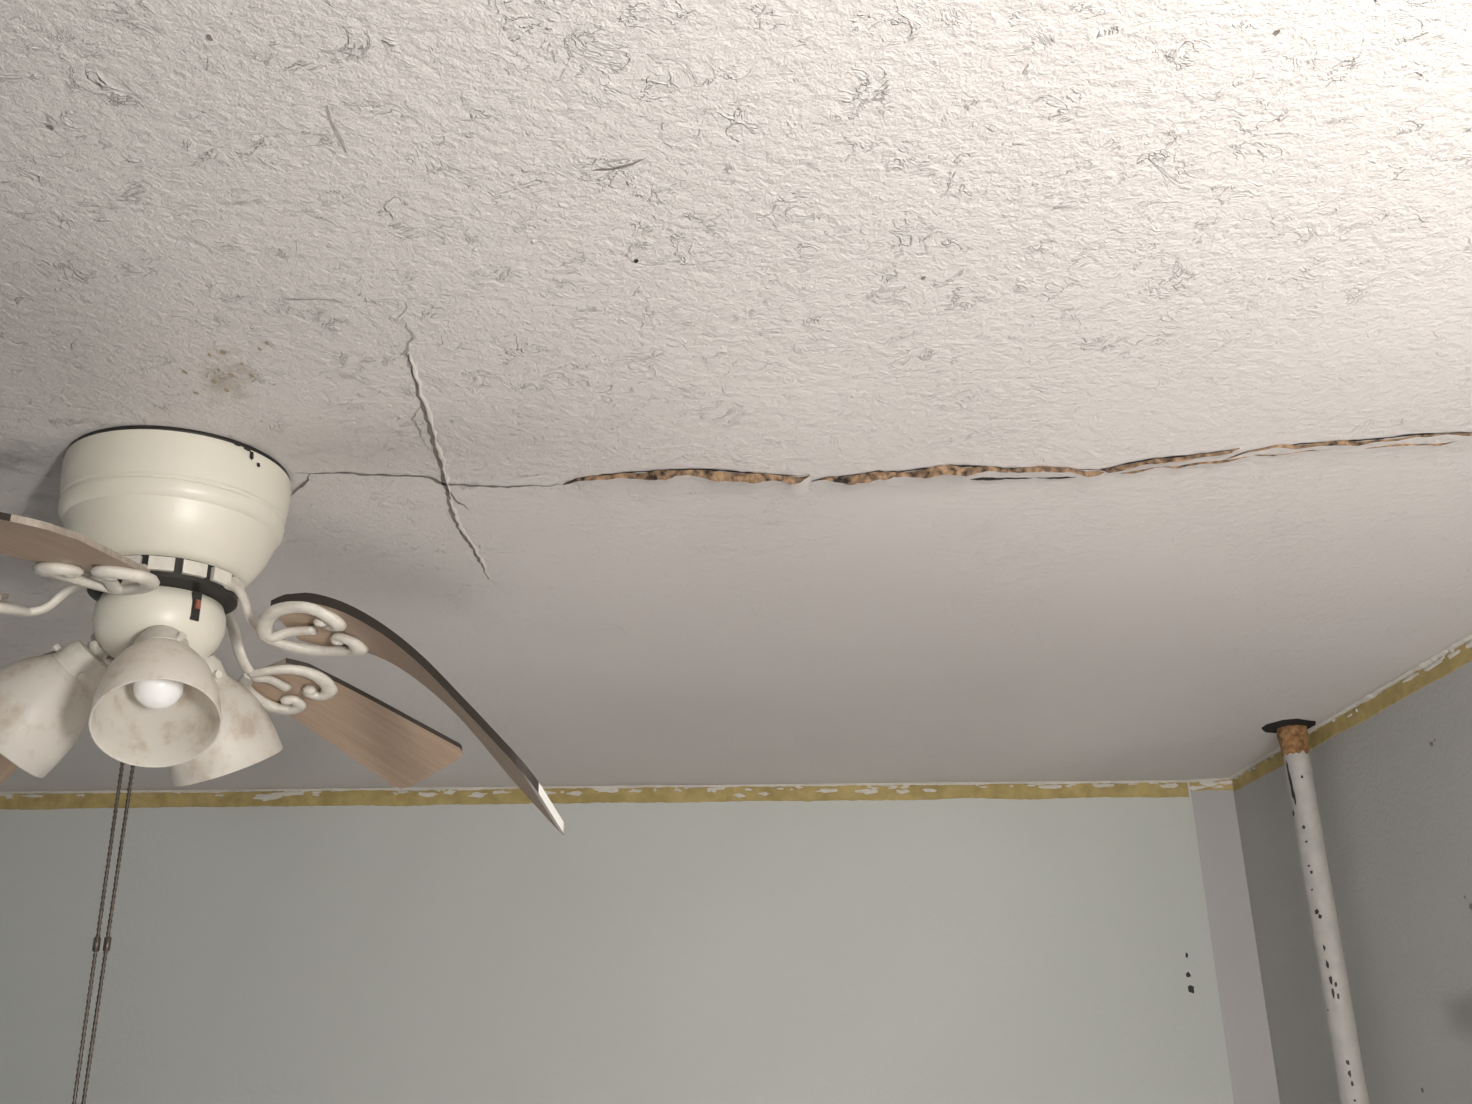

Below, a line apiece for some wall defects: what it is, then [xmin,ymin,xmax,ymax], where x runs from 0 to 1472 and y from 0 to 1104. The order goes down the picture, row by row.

crack [291,319,1472,579]
peeling [1308,634,1472,750]
peeling [0,747,1308,843]